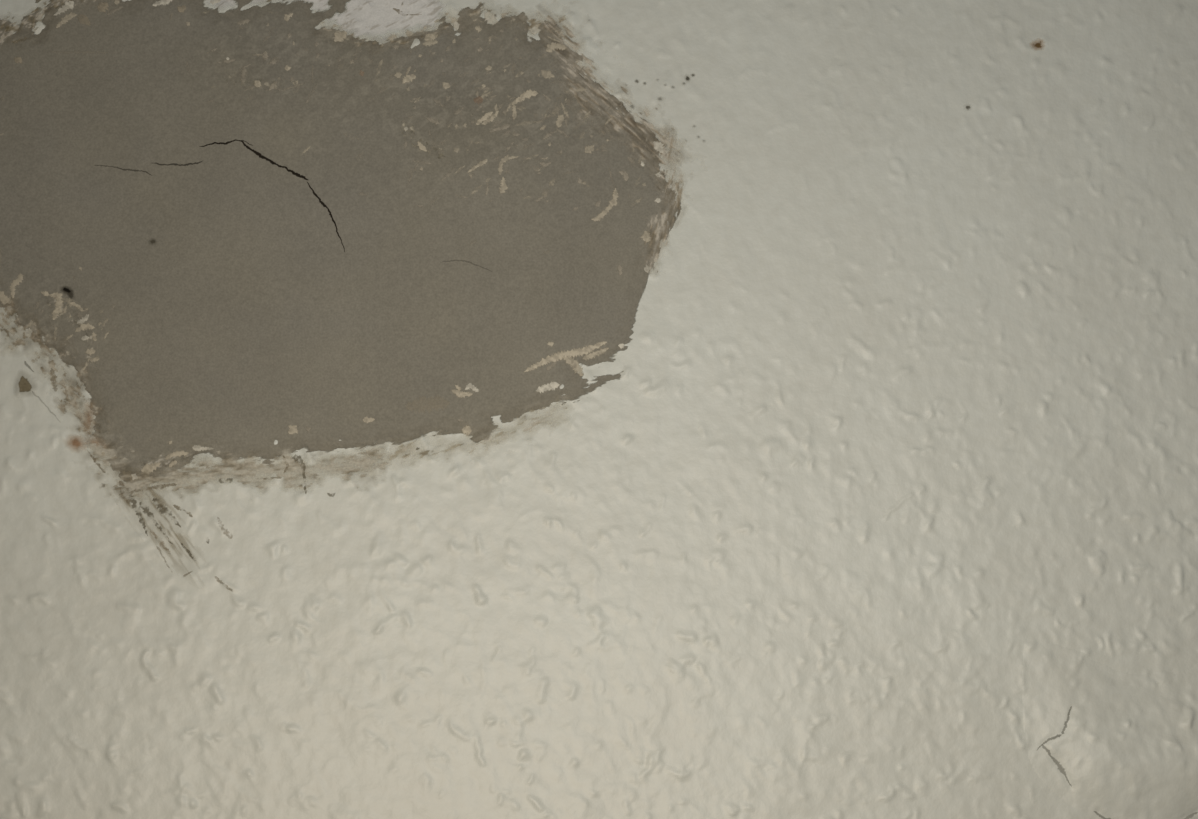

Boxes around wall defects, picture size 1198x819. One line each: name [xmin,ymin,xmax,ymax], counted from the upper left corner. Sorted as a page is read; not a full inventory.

crack [199,139,345,252]
flaking render [0,0,683,559]